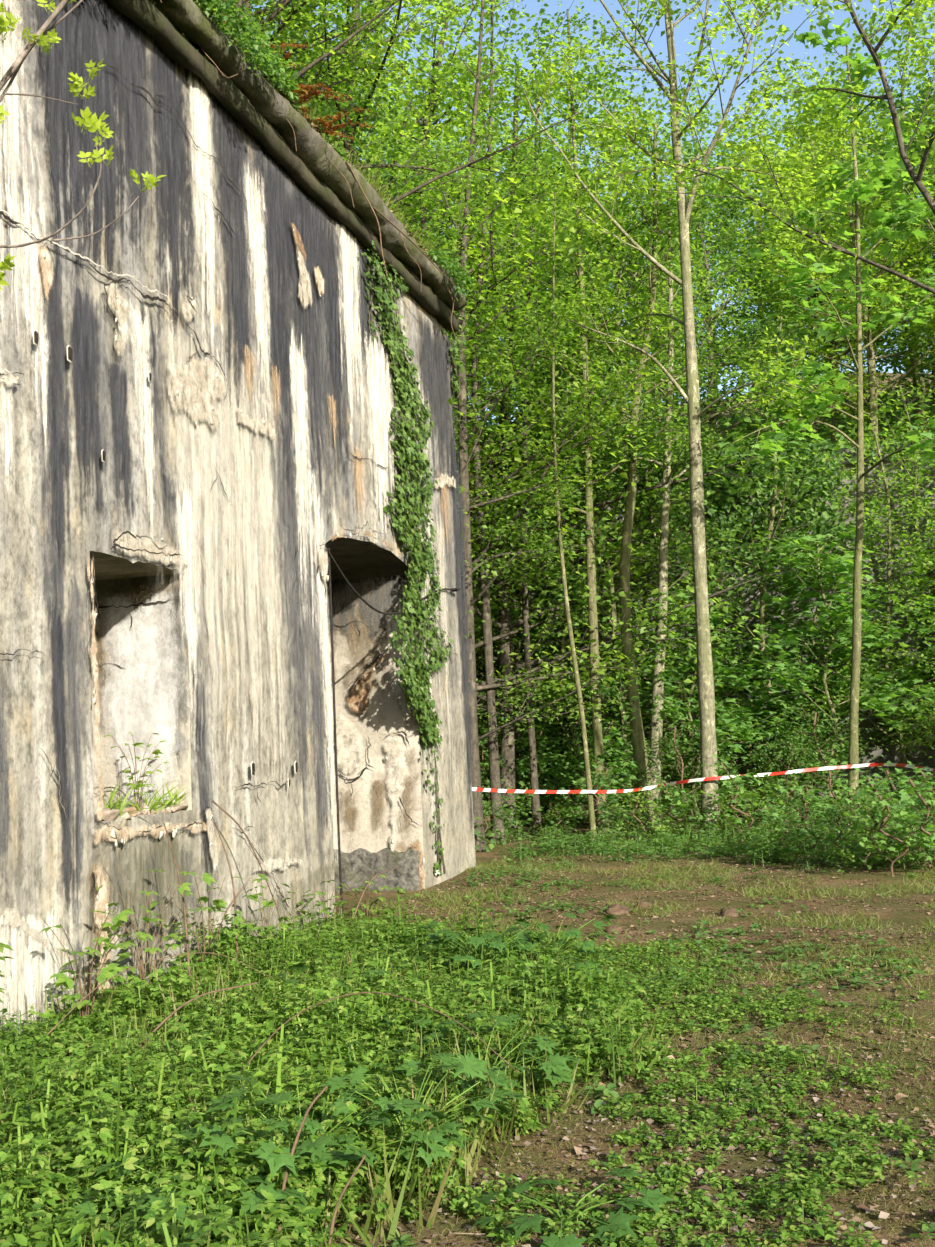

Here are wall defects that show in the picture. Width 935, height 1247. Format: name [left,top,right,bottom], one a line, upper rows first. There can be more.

crack [0,210,228,401]
spalling [290,222,324,307]
peeling [167,359,226,430]
peeling [237,408,276,440]
leakage [0,0,394,950]
spalling [435,471,457,489]
spalling [113,530,191,566]
leakage [414,318,474,825]
spalling [87,554,219,869]
peeling [333,651,411,774]
crack [338,730,417,796]